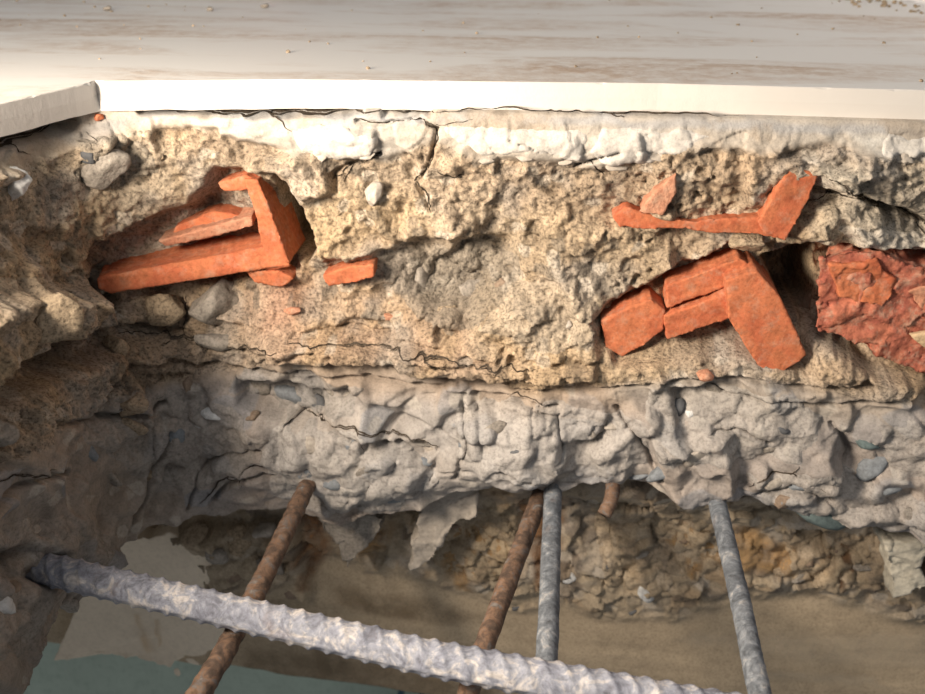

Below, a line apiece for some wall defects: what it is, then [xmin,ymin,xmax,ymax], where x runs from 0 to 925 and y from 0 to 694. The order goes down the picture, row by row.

crack [165,106,738,210]
crack [118,303,542,405]
crack [289,398,437,450]
rust [299,514,327,590]
spalling [0,366,925,694]
rust [534,516,543,585]